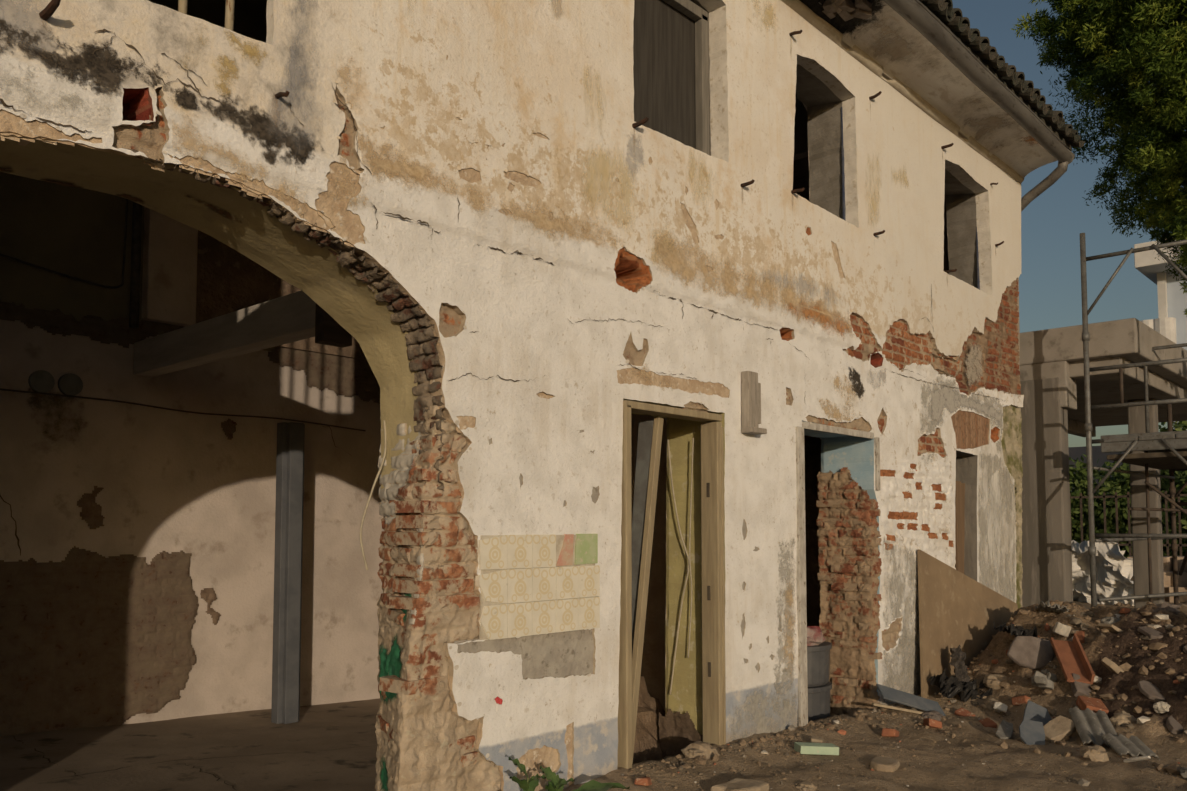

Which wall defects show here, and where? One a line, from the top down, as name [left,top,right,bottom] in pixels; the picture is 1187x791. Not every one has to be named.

leakage [0,0,125,94]
flaking render [819,0,872,21]
leakage [176,30,324,165]
leakage [369,145,456,190]
leakage [503,206,601,240]
flaking render [614,245,653,293]
leakage [655,233,852,332]
peeling [617,333,730,413]
flaking render [0,80,596,791]
crack [0,495,21,556]
flaking render [805,278,1023,716]